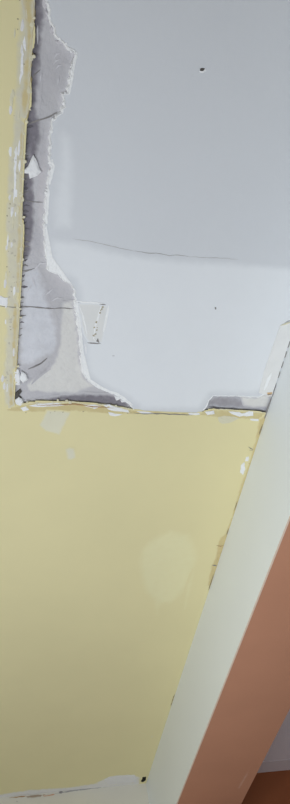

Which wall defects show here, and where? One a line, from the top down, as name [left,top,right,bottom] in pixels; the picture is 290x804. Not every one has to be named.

flaking render [0,0,290,589]